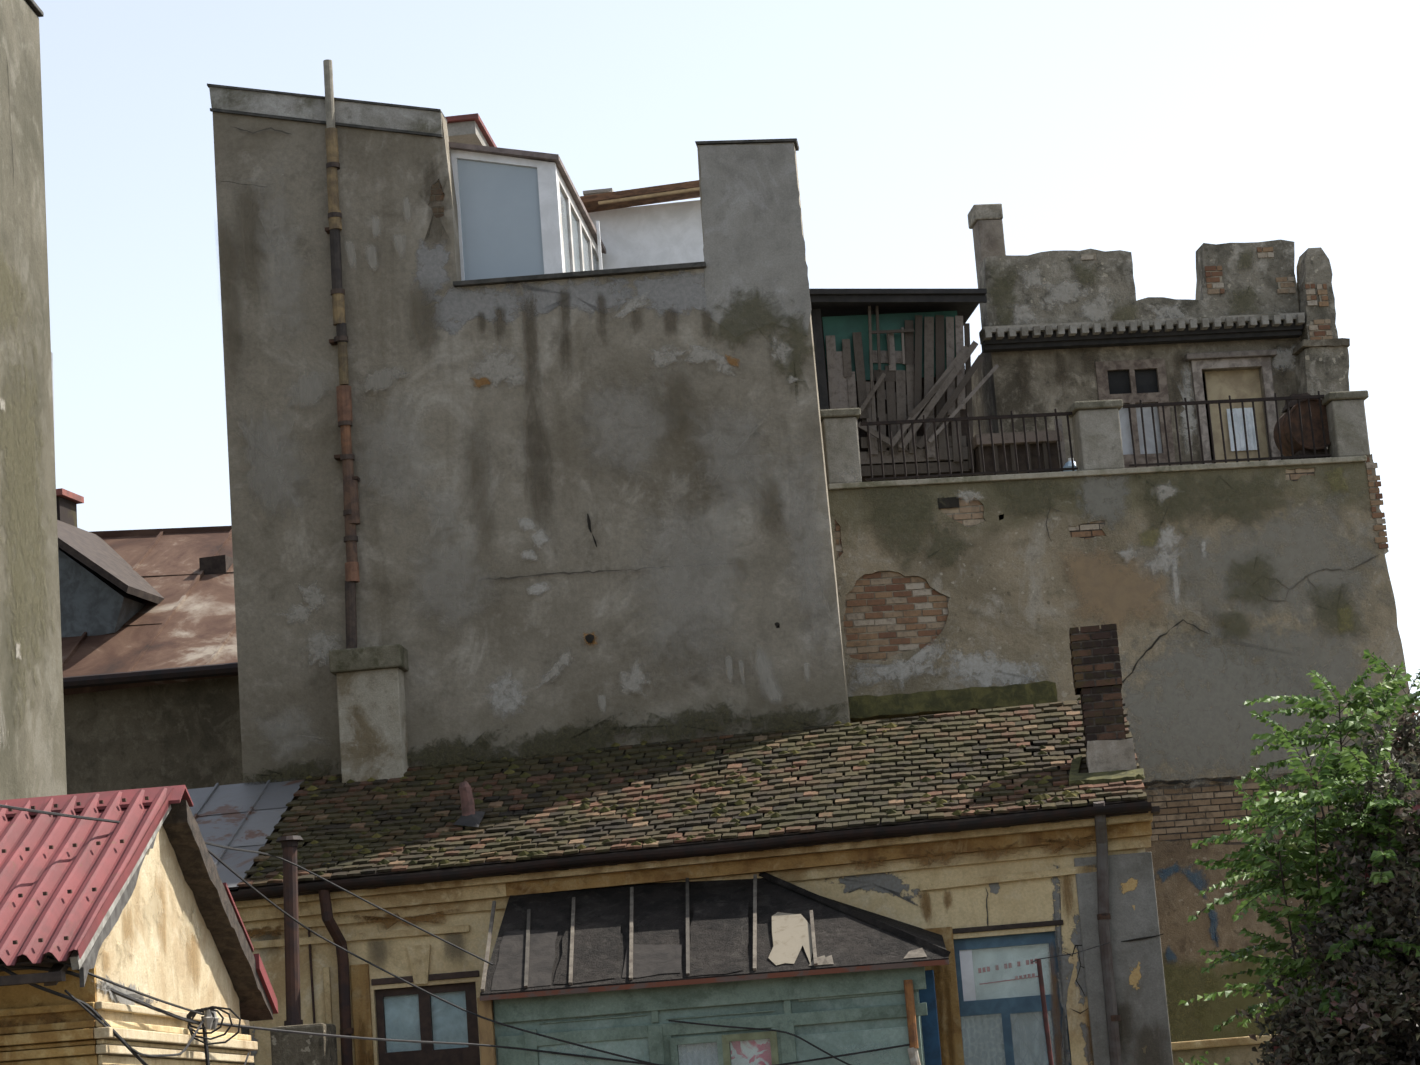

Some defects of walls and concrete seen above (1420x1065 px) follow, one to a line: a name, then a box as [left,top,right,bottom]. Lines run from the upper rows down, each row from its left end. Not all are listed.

leakage [526,305,535,376]
flaking render [1366,454,1389,555]
leakage [520,518,548,560]
crack [1263,554,1380,602]
flaking render [843,571,949,661]
crack [1122,619,1209,683]
peeling [825,873,921,905]
peeling [1119,878,1138,910]
peeling [1129,961,1141,990]